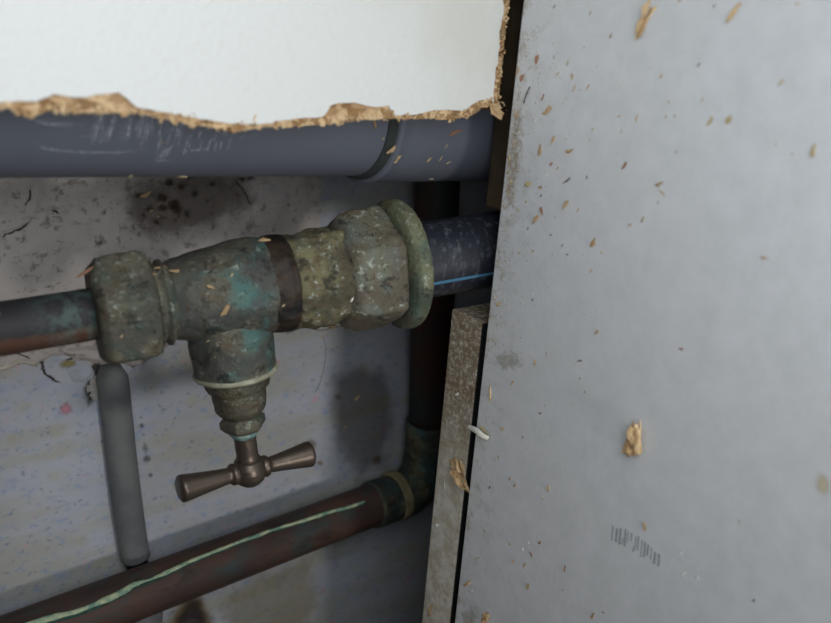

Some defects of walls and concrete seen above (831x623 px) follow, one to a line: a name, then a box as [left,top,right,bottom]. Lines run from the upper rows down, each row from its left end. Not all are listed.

crack [2,190,31,238]